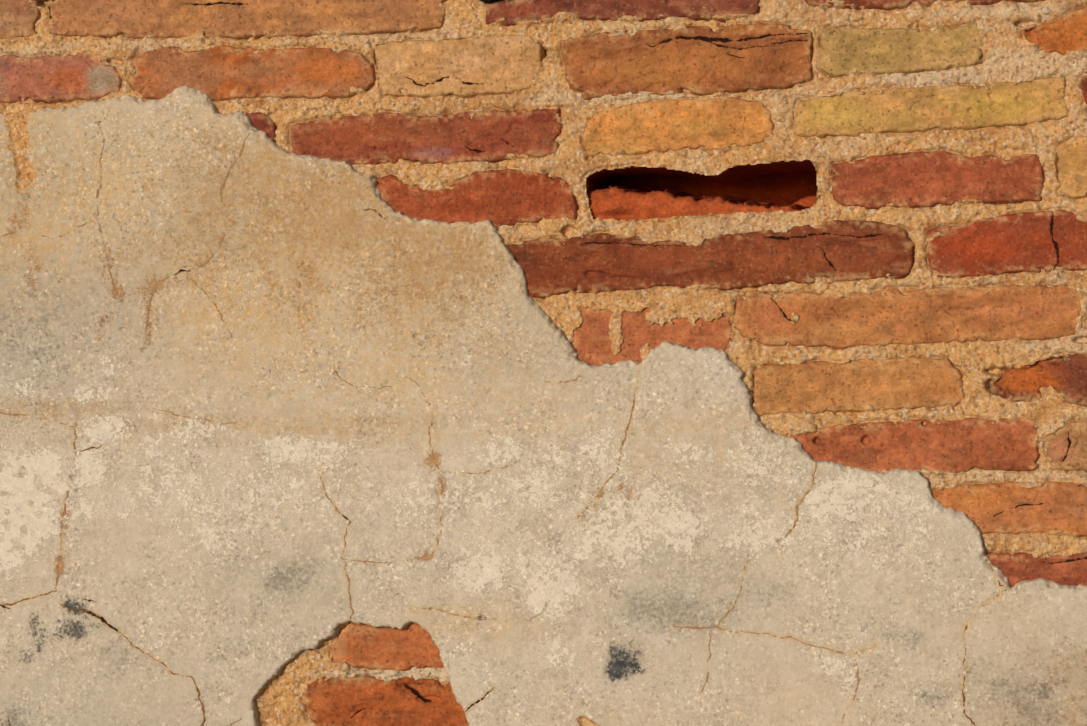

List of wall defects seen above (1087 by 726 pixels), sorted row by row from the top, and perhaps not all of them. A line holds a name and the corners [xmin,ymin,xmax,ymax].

spalling [1023,17,1074,55]
flaking render [4,112,37,194]
peeling [110,85,1087,680]
peeling [0,347,357,593]
crack [320,368,521,623]
crack [782,459,817,546]
crack [0,490,241,726]
flaking render [251,621,470,726]
crack [403,682,432,702]
damp [606,646,645,681]
crack [674,554,871,722]
crack [962,626,975,726]